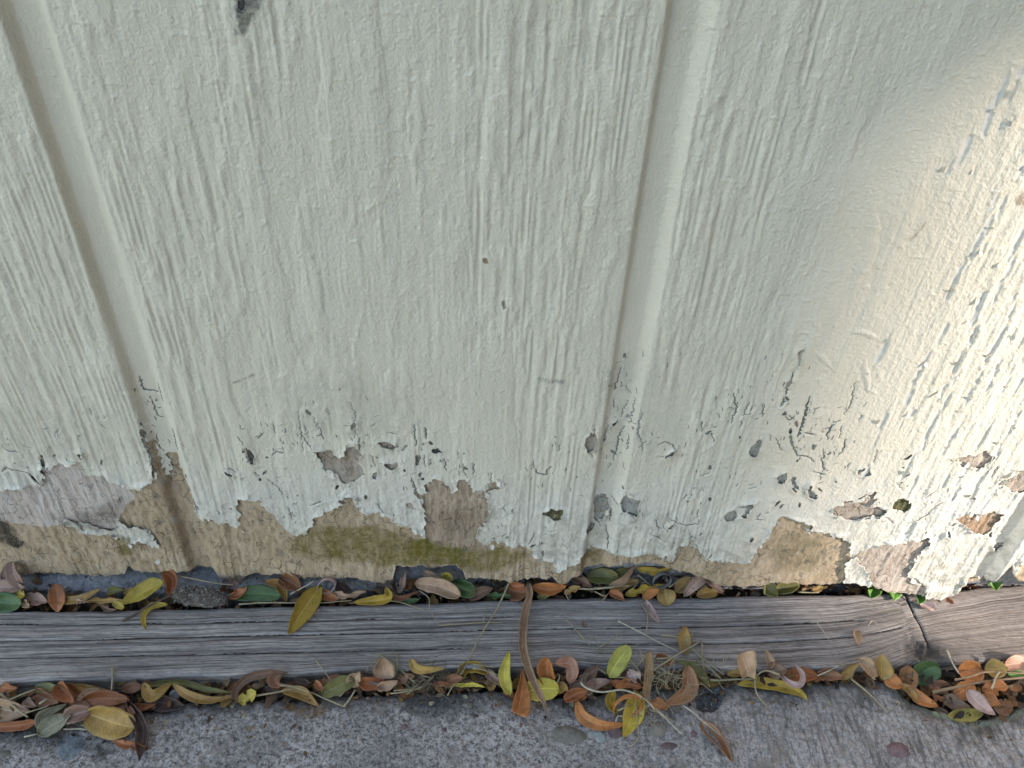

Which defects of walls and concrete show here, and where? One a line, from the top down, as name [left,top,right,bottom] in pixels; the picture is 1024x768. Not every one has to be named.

peeling [0,225,1024,597]
crack [525,351,878,560]